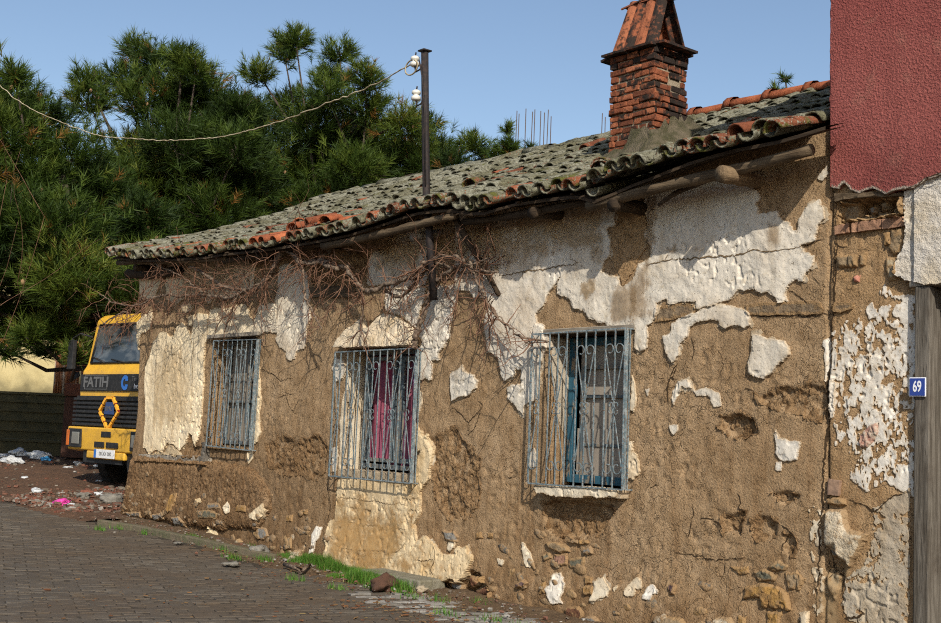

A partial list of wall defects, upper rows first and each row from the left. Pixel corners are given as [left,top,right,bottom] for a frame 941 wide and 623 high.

flaking render [125,493,187,528]
flaking render [136,181,915,623]
crack [647,197,866,623]
crack [852,494,902,512]